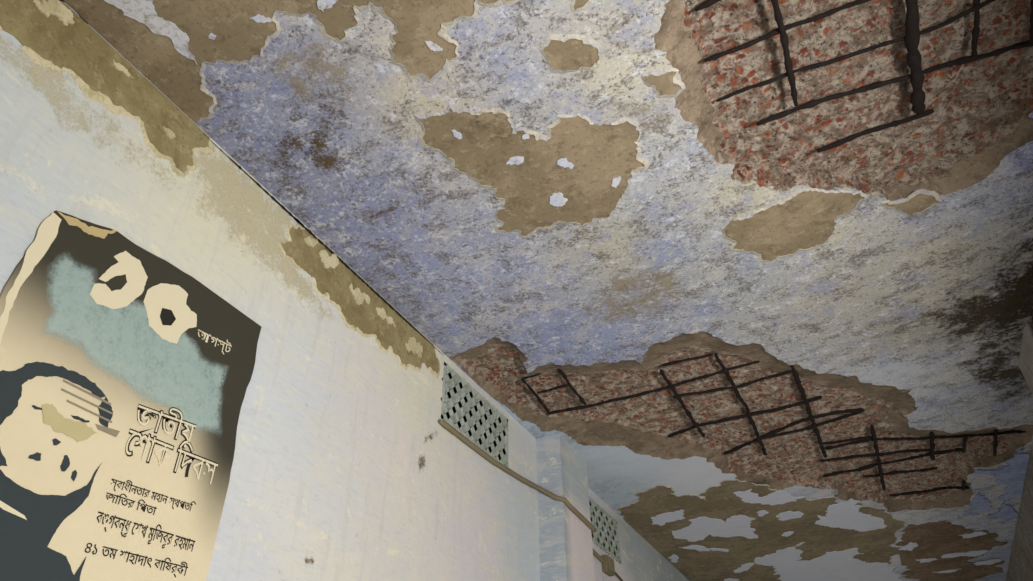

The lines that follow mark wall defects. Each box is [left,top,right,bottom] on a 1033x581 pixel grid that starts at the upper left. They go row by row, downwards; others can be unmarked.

peeling [0,0,520,178]
peeling [413,104,649,238]
peeling [539,34,605,74]
peeling [570,0,593,12]
spalling [641,0,1033,262]
water stain [931,221,1033,401]
spalling [279,222,1033,581]